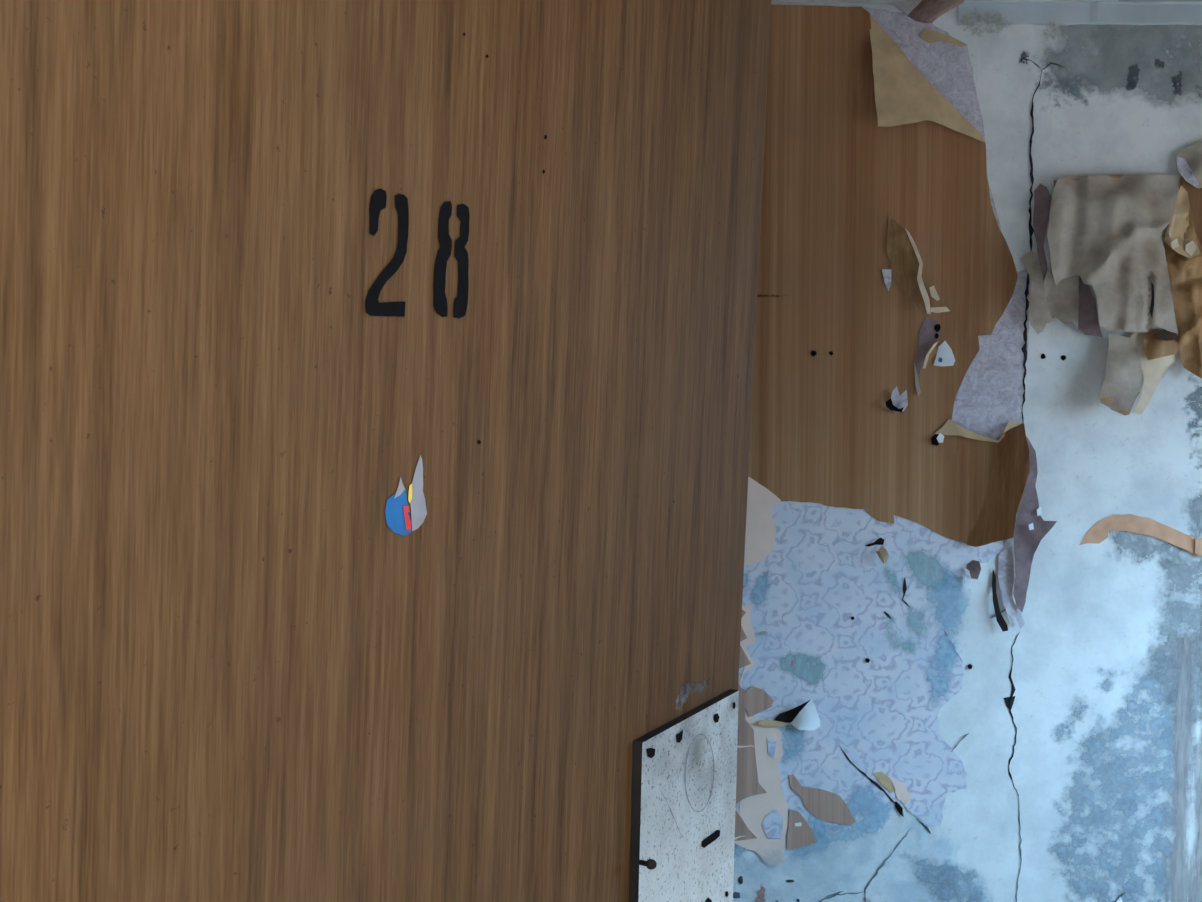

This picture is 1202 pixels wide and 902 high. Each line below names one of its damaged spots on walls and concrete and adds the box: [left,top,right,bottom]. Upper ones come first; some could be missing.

peeling [870,15,985,143]
crack [1021,58,1064,423]
peeling [1020,141,1202,437]
flaking render [885,386,908,413]
peeling [931,419,1020,446]
peeling [865,537,889,564]
peeling [966,546,1025,632]
flaking render [1112,531,1202,723]
flaking render [1189,495,1202,534]
crack [818,745,931,902]
crack [1004,632,1022,902]
damp [1051,635,1202,902]